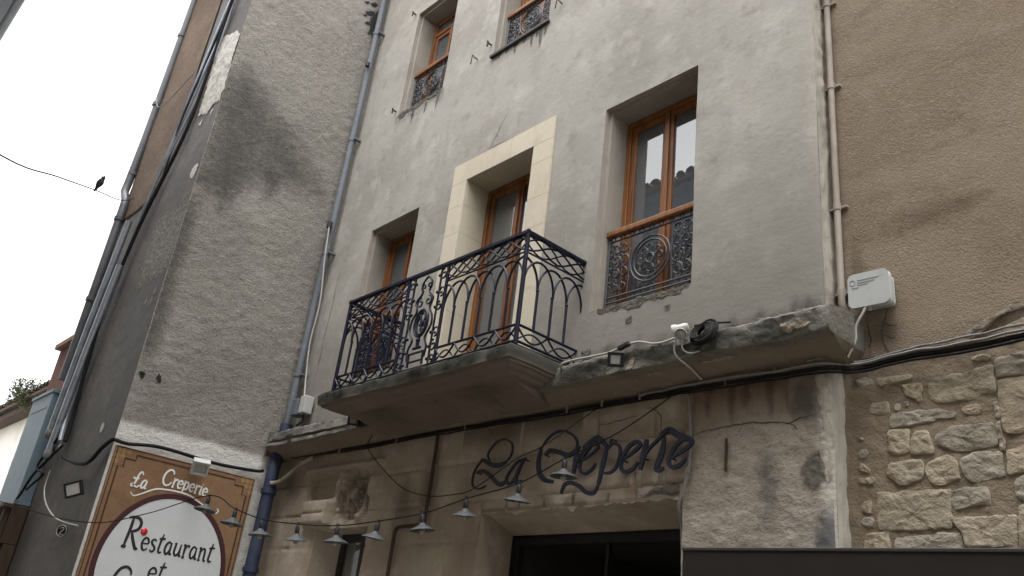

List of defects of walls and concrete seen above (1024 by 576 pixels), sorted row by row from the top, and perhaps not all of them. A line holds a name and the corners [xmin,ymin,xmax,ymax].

peeling [198,30,240,125]
crack [692,414,817,436]